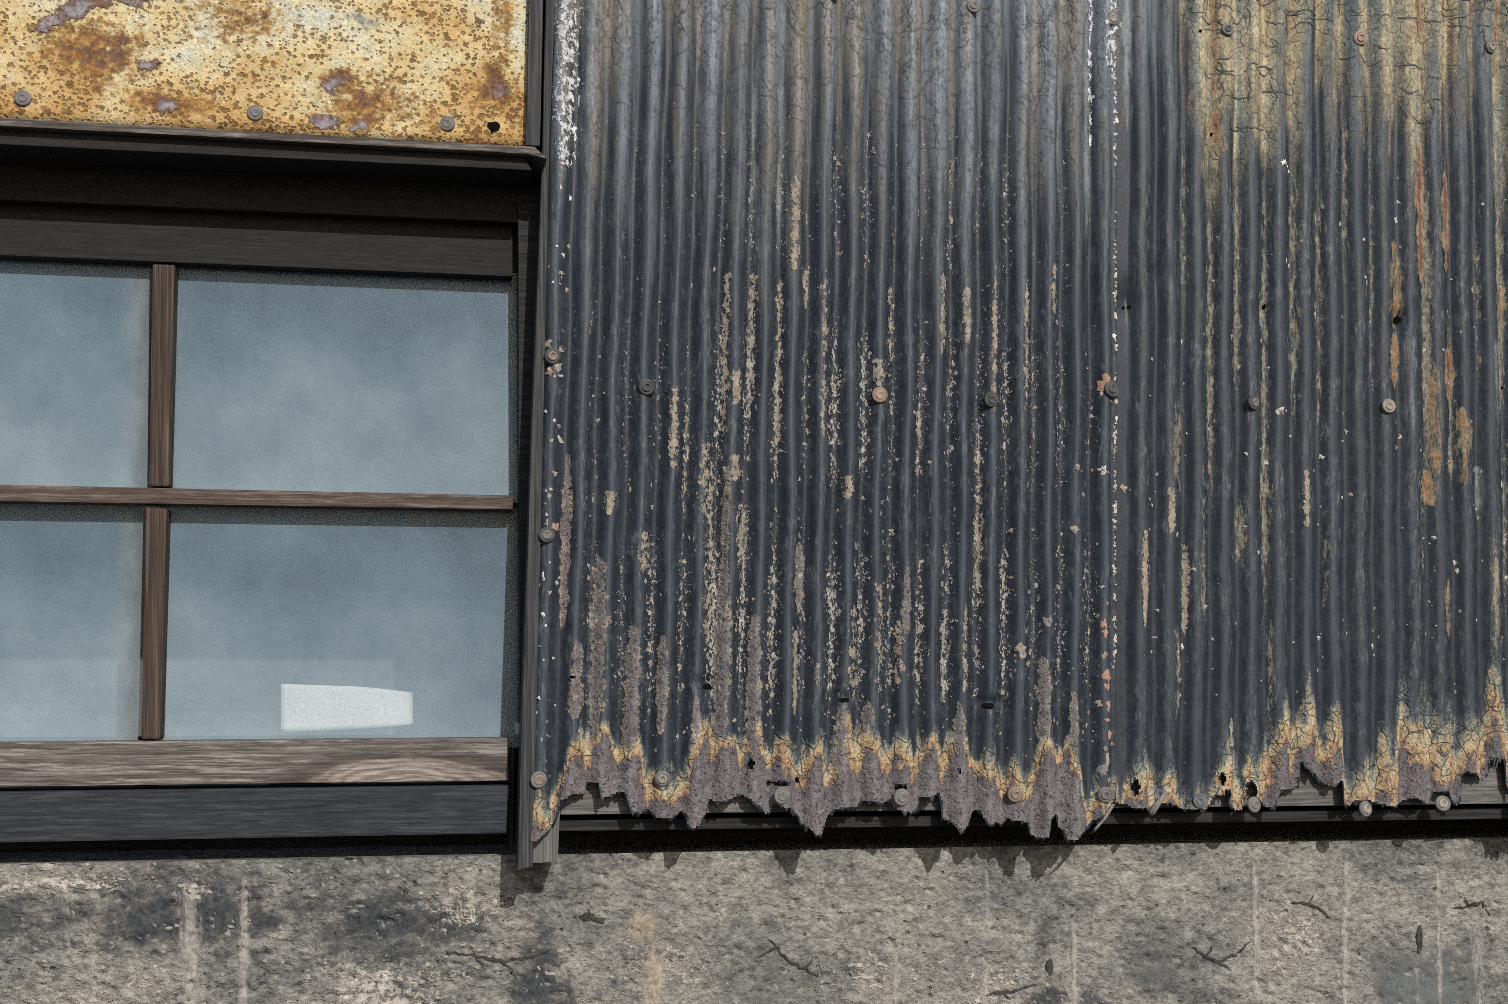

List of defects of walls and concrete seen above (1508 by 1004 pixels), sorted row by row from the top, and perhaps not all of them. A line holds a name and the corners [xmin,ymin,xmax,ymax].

rust [40,17,221,119]
rust [182,0,298,63]
rust [305,66,423,131]
rust [1179,0,1508,282]
peeling [536,105,1131,784]
peeling [1149,135,1242,713]
peeling [1235,100,1375,607]
rust [1422,348,1472,505]
peeling [1394,167,1506,570]
peeling [1138,528,1159,653]
peeling [1458,480,1508,660]
rust [531,660,1508,841]